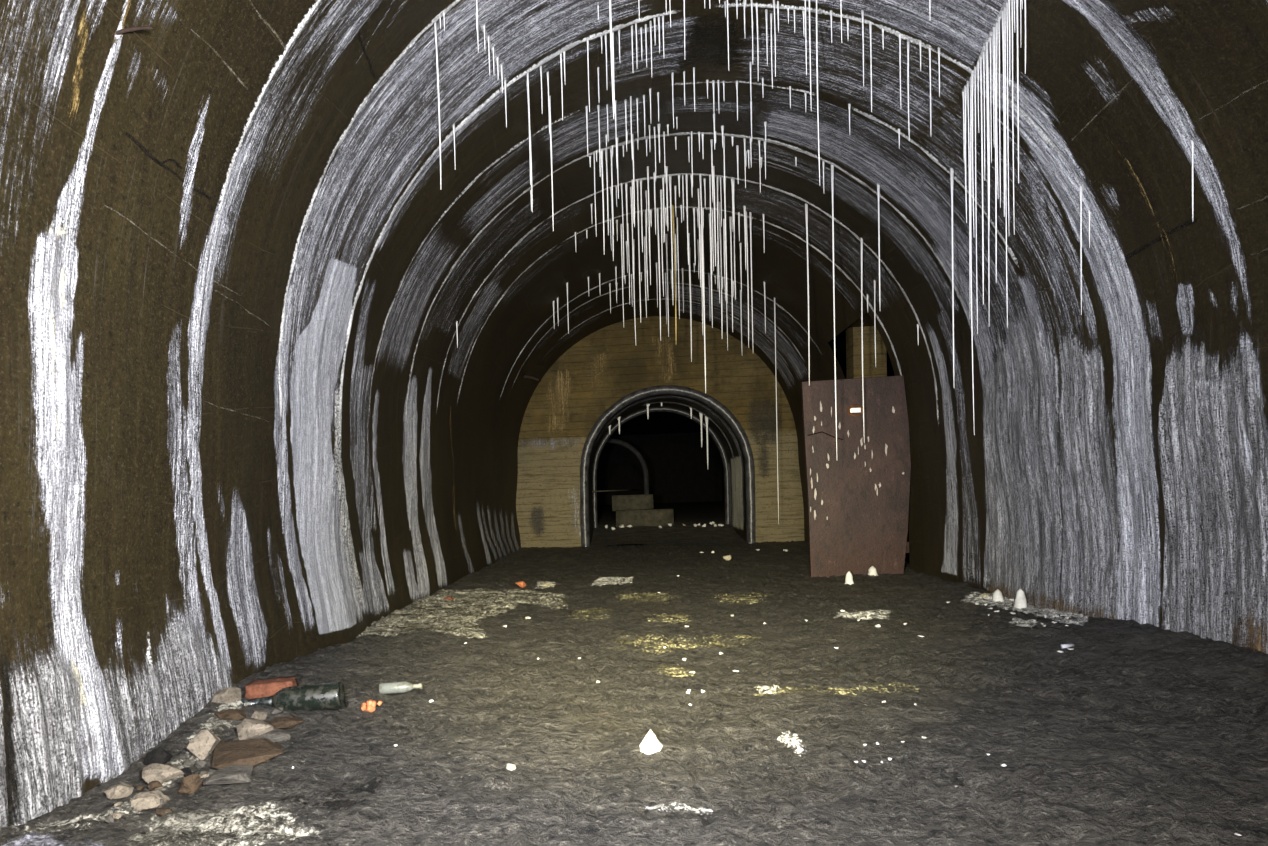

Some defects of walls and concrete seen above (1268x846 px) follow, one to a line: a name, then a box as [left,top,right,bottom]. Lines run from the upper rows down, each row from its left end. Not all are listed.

water stain [1063,0,1250,314]
water stain [10,0,176,781]
water stain [168,0,384,673]
water stain [1176,284,1194,334]
water stain [2,660,387,846]
water stain [592,576,755,678]
water stain [754,682,918,696]